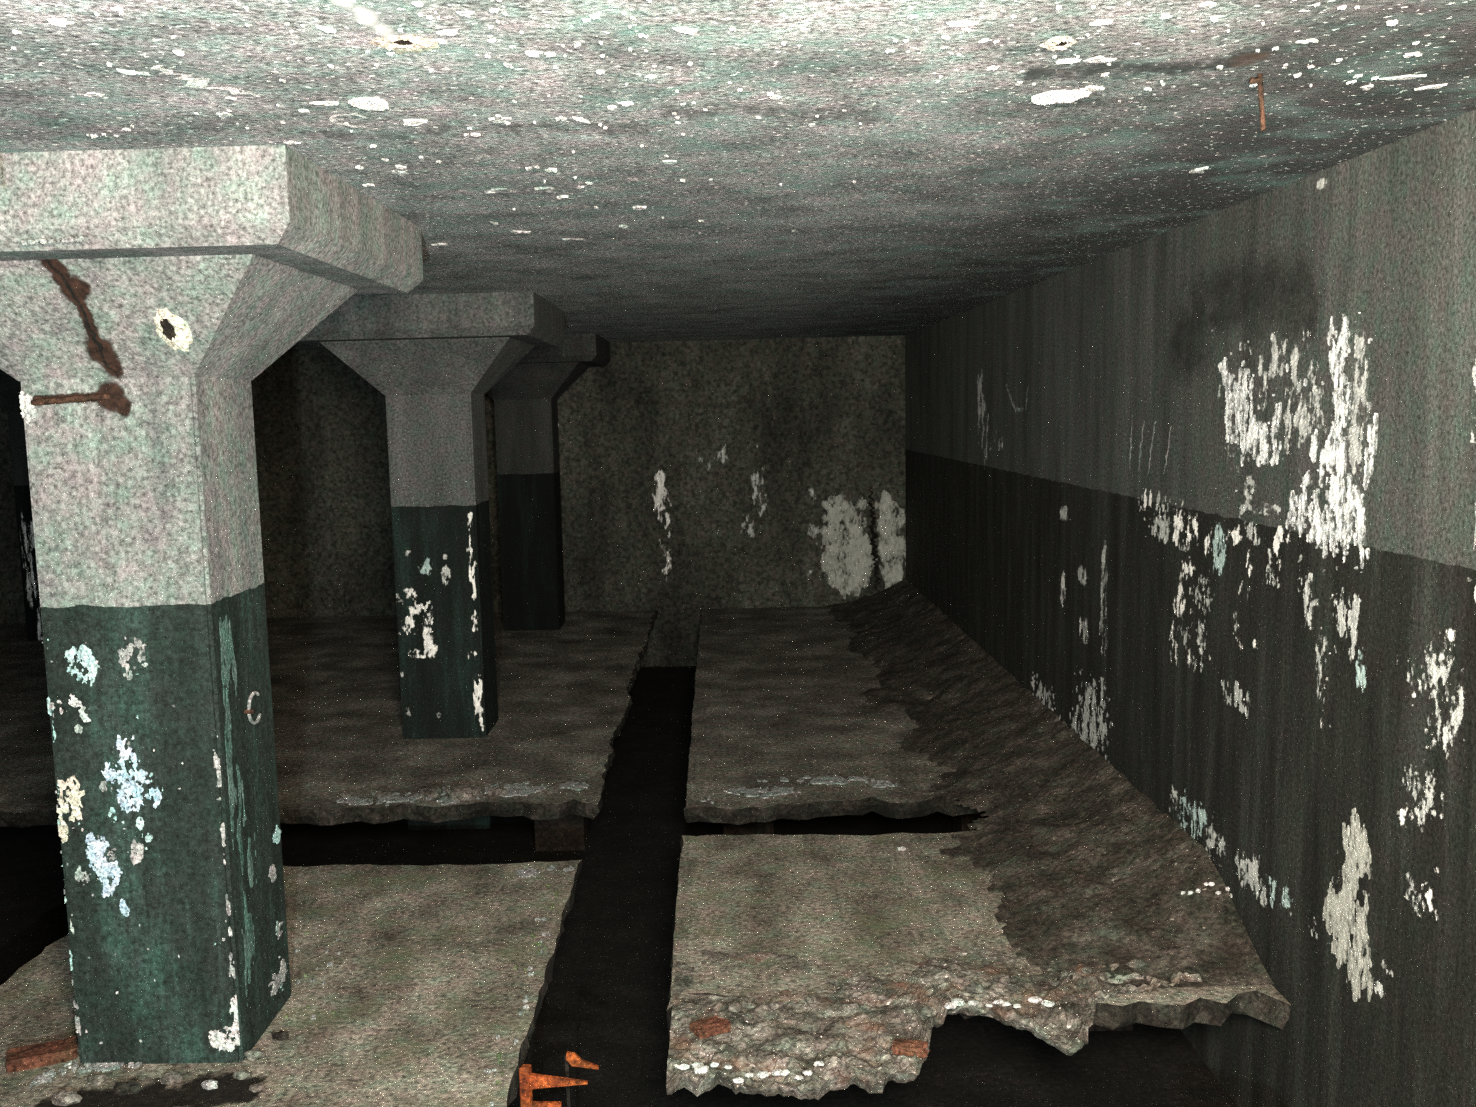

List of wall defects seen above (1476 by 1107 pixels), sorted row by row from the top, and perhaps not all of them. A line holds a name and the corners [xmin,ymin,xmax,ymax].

corrosion [33,259,131,417]
peeling [20,515,100,742]
peeling [118,636,148,680]
peeling [396,550,451,658]
peeling [467,512,478,632]
peeling [473,679,484,731]
peeling [808,488,906,599]
peeling [1221,681,1249,717]
peeling [1140,312,1378,701]
peeling [55,715,181,1044]
peeling [1311,808,1393,1002]